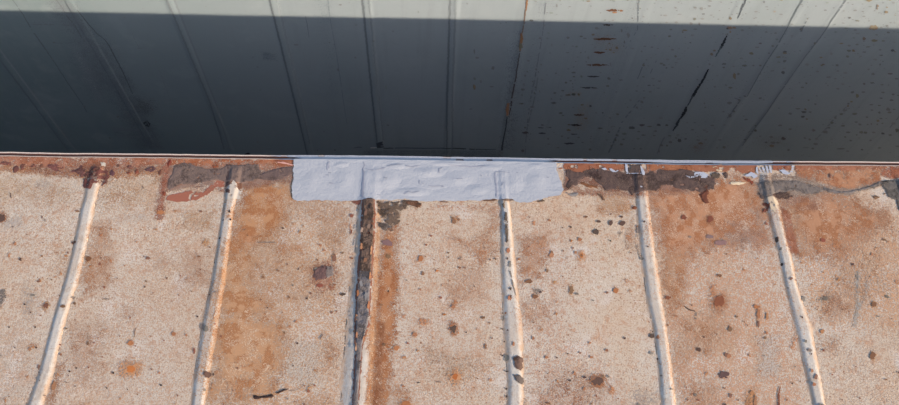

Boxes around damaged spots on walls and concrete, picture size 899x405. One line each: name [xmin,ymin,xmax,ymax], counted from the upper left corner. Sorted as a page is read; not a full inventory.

crack [673,0,746,131]
peeling [0,160,293,196]
peeling [566,164,899,213]
rust [0,156,362,405]
peeling [340,198,421,405]